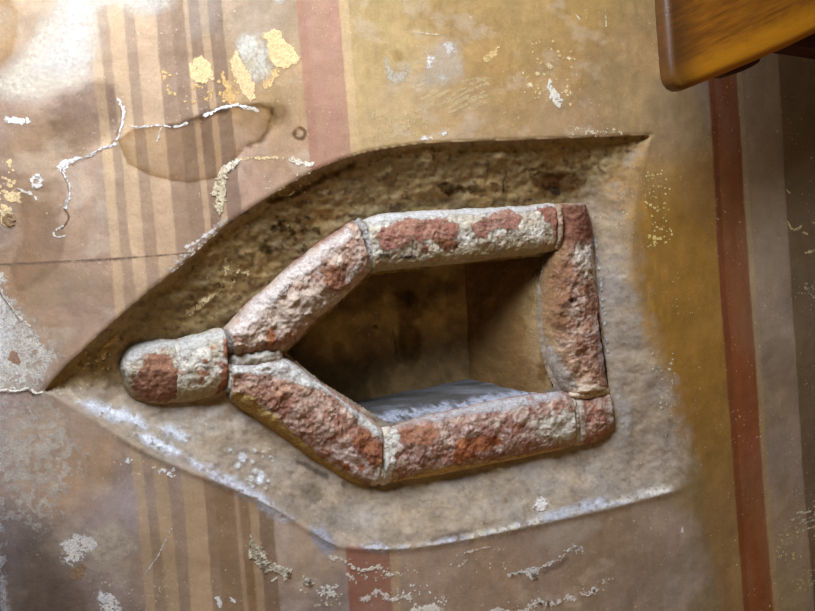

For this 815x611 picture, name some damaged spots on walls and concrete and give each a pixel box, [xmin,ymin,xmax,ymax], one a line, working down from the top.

peeling [161,29,300,104]
peeling [522,40,577,108]
peeling [0,159,43,219]
crack [53,98,259,238]
peeling [211,155,314,215]
crack [0,292,31,328]
crack [597,308,608,384]
crack [0,377,43,396]
leakage [0,272,80,531]
leakage [0,556,8,611]